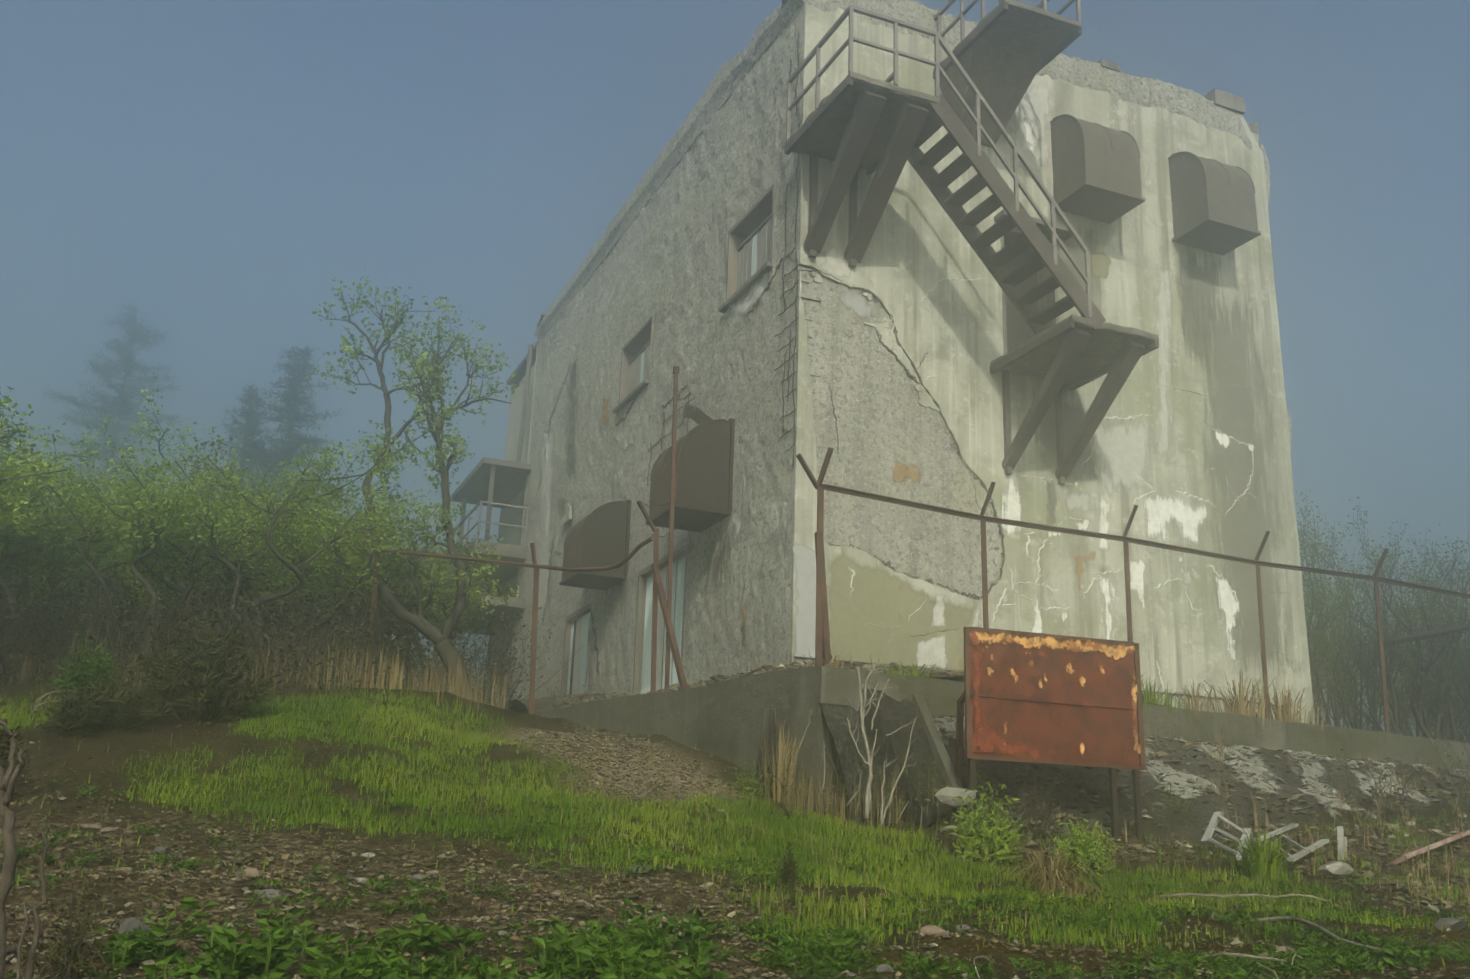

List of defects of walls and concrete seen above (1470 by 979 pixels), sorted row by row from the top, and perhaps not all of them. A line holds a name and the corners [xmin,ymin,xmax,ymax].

crack [829,383,839,453]